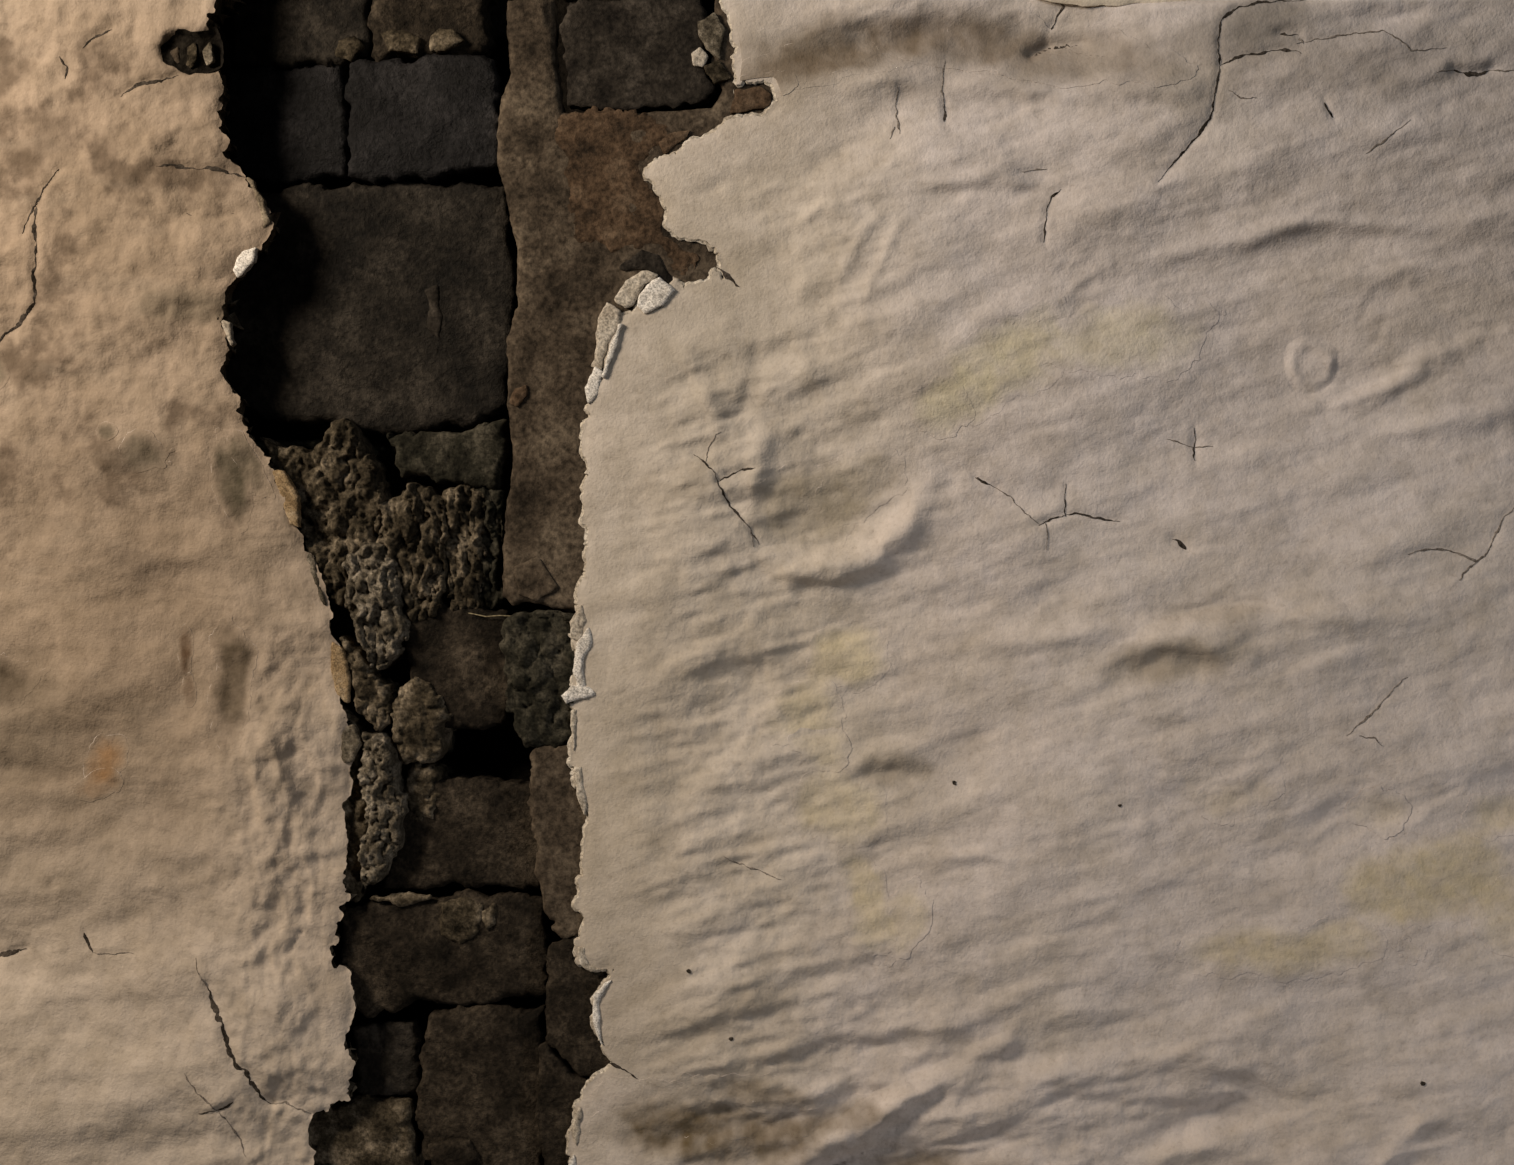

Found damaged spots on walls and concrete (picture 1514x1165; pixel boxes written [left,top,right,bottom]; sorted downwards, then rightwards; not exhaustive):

water stain [739,0,1198,96]
crack [1162,0,1514,177]
flaking render [233,247,258,278]
flaking render [222,320,236,347]
spalling [497,0,773,748]
flaking render [273,470,302,527]
crack [975,477,1120,550]
crack [1408,508,1514,581]
flaking render [574,766,588,815]
flaking render [578,947,611,1044]
water stain [579,1072,870,1165]
water stain [820,1140,1040,1165]